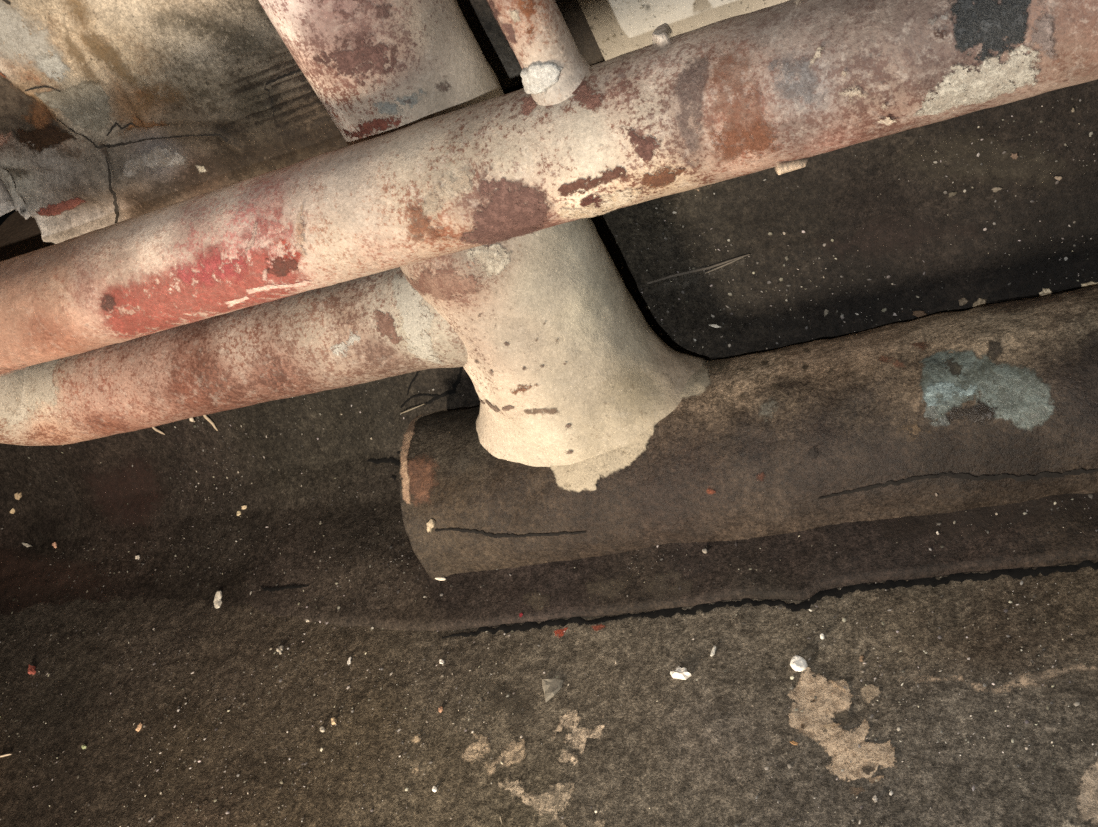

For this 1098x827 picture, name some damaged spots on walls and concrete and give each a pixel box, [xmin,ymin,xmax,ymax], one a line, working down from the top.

crack [25,85,60,93]
corrosion [313,34,398,87]
corrosion [712,57,776,162]
crack [57,119,228,223]
corrosion [621,128,684,190]
corrosion [405,167,627,245]
corrosion [265,257,298,277]
spalling [942,358,966,377]
hole [946,400,997,423]
crack [435,528,586,538]
crack [442,560,1098,638]
peeling [788,667,897,796]